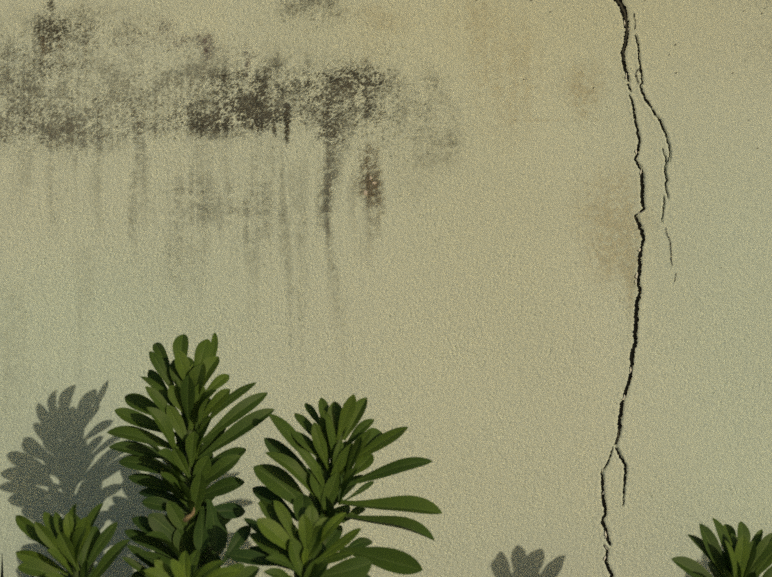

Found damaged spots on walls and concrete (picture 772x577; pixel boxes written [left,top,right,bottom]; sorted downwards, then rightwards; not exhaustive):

mould [35,1,83,49]
mould [0,61,105,149]
mould [110,65,384,142]
crack [601,0,677,577]